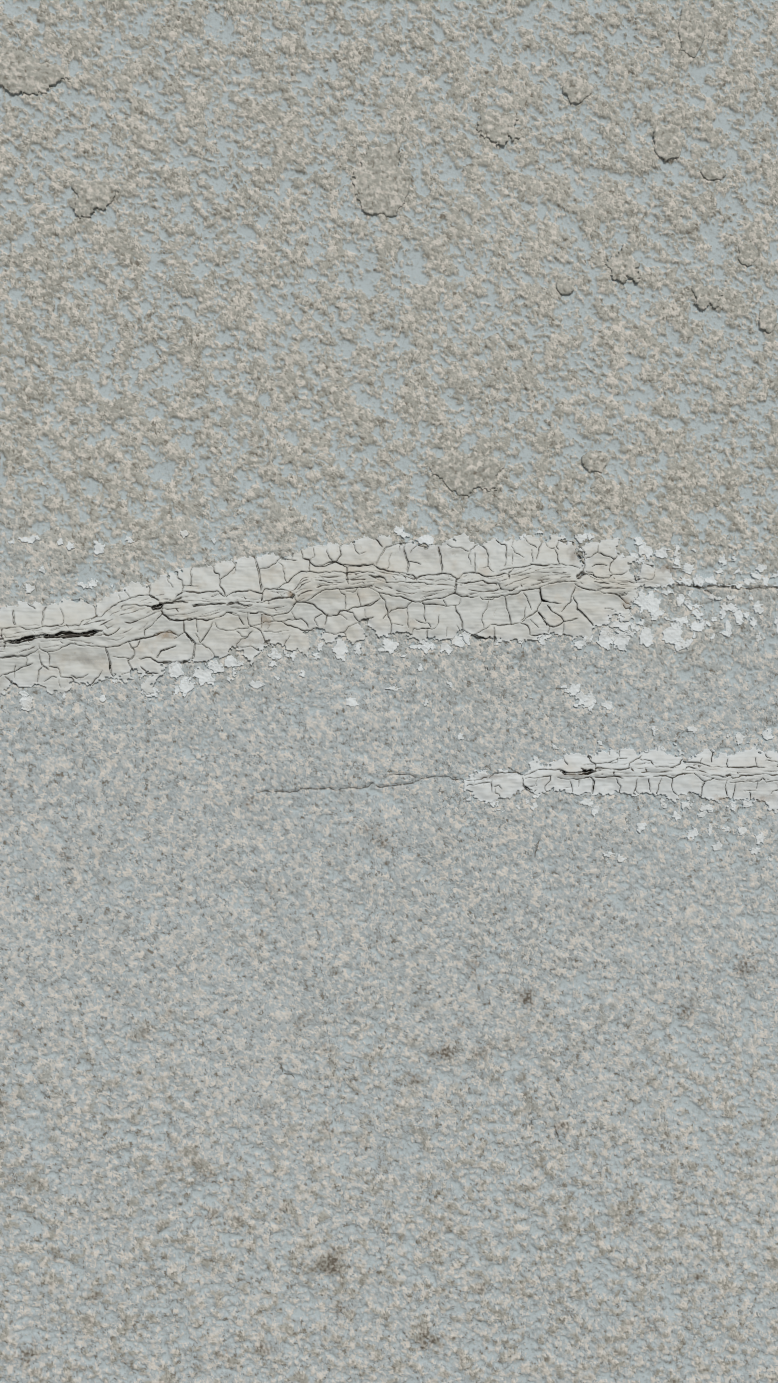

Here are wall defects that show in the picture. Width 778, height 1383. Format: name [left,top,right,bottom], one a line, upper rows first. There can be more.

peeling [0,526,778,712]
crack [654,571,778,594]
crack [257,774,464,793]
peeling [462,726,778,861]